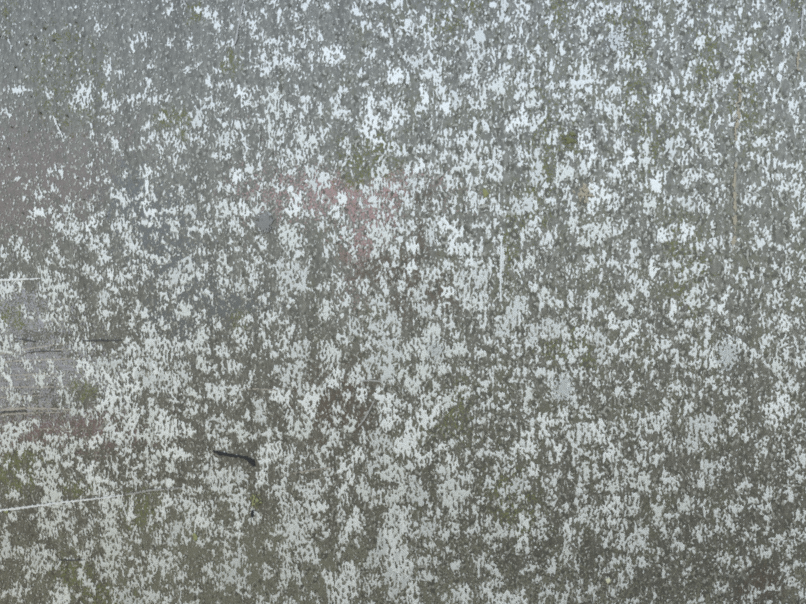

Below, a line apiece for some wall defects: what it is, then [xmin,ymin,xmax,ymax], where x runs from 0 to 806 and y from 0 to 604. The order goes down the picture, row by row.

spalling [213,451,255,467]